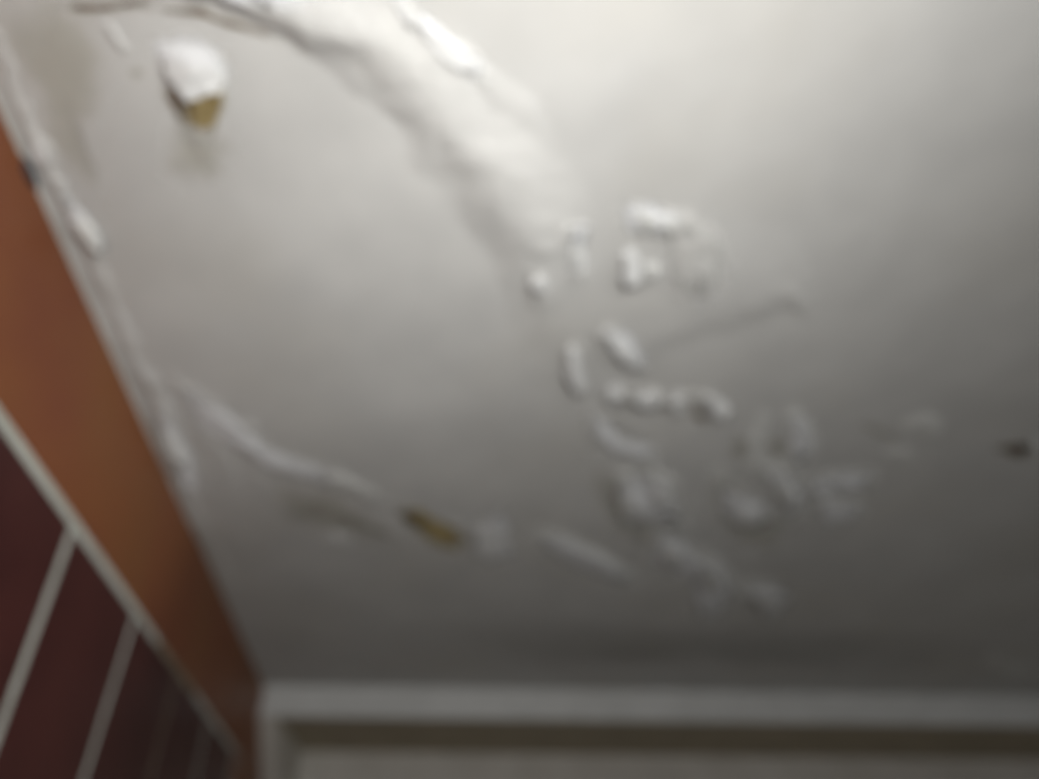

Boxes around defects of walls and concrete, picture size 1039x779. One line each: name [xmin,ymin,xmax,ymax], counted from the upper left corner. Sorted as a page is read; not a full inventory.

peeling [154,37,227,129]
peeling [521,219,593,323]
peeling [611,201,730,308]
peeling [560,317,735,422]
peeling [611,458,691,535]